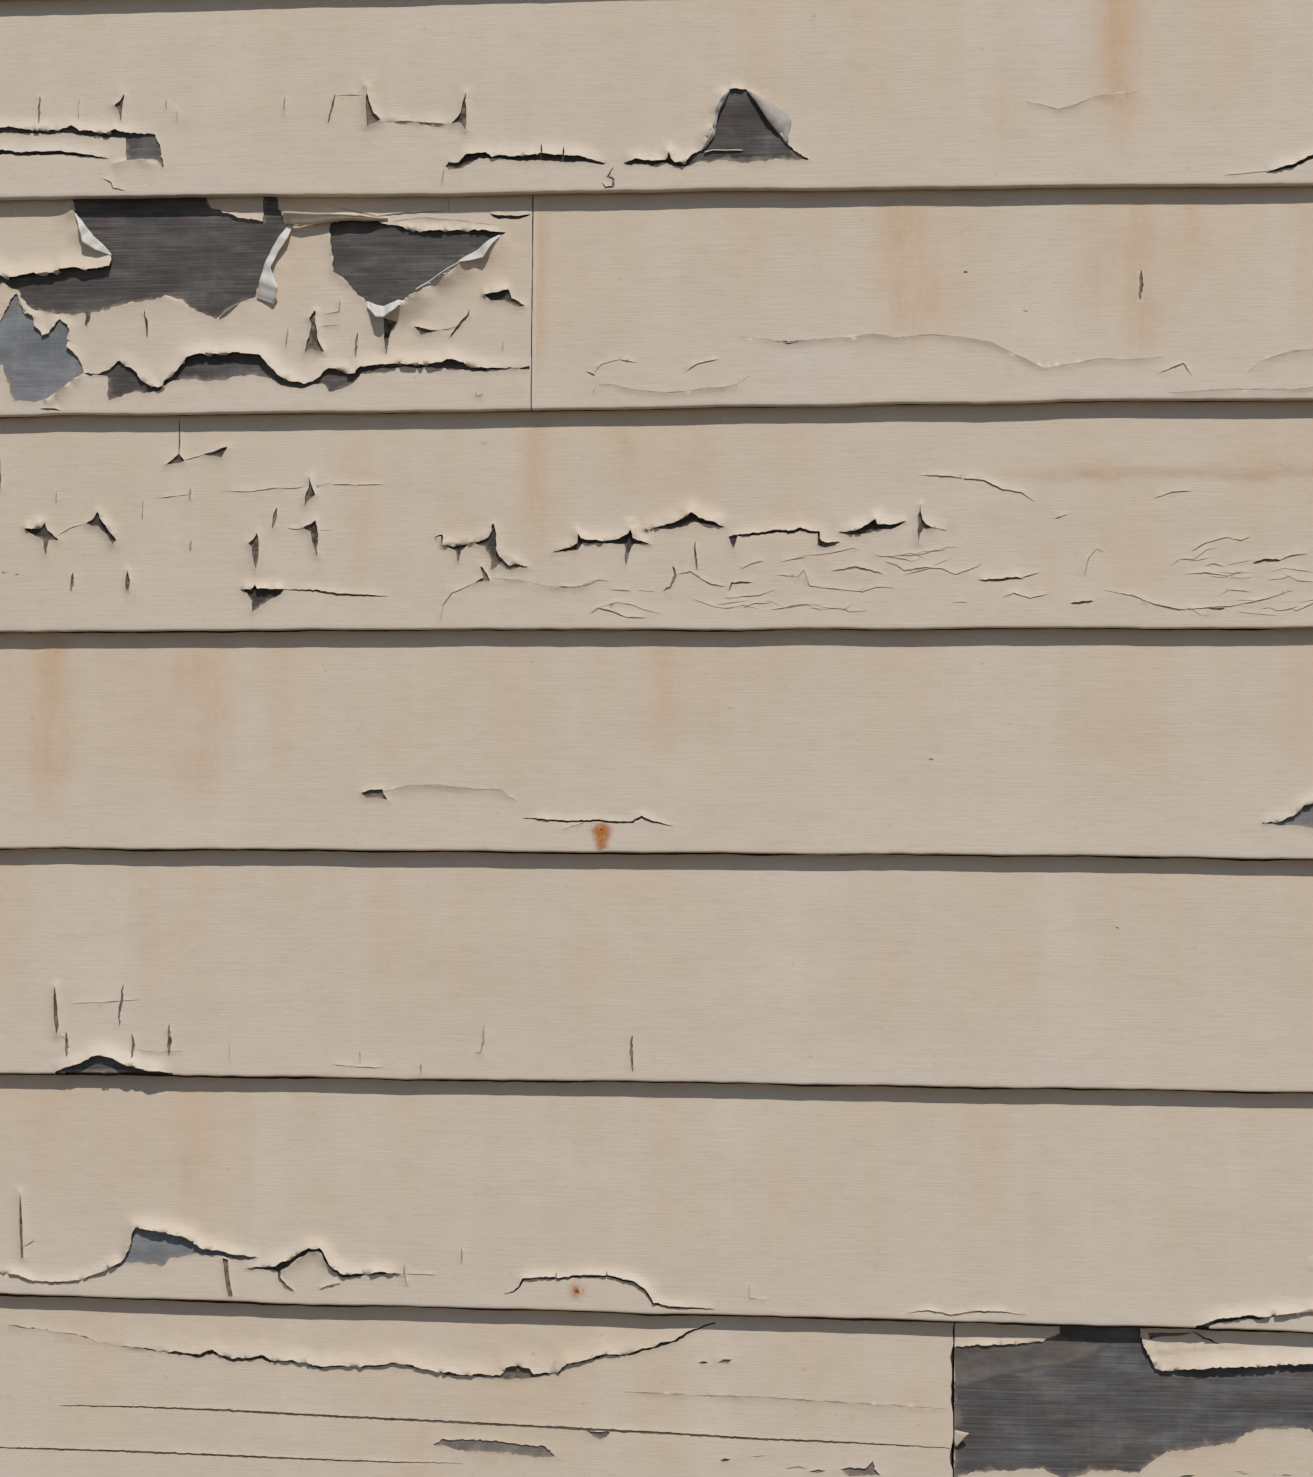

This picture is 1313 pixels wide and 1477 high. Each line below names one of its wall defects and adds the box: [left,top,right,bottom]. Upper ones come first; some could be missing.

peeling [442,89,809,188]
crack [1229,155,1313,175]
peeling [0,126,530,402]
crack [436,475,1313,620]
corrosion [595,823,608,849]
peeling [1262,804,1313,828]
peeling [56,1055,166,1073]
peeling [40,1228,430,1296]
peeling [954,1326,1313,1477]
peeling [434,1439,554,1457]